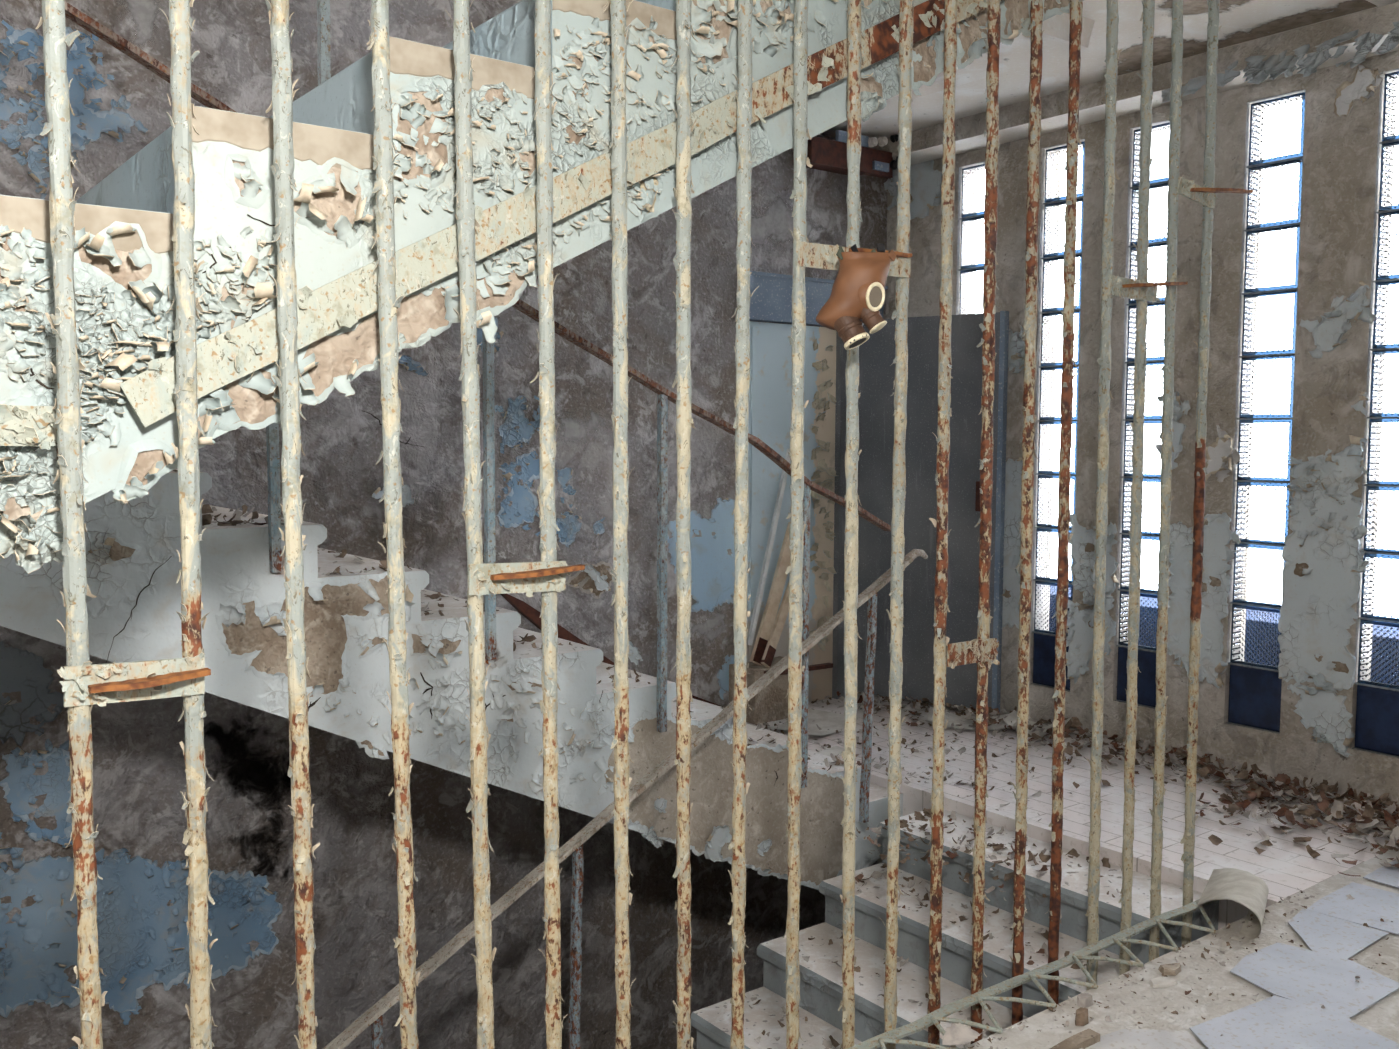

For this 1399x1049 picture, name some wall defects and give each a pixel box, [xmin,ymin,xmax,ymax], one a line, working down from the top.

peeling [74,221,178,505]
peeling [197,365,281,449]
peeling [297,310,380,406]
peeling [397,166,671,377]
peeling [0,446,64,574]
crack [106,556,172,662]
peeling [1278,435,1369,758]
peeling [0,641,80,1018]
water stain [204,716,291,879]
peeling [304,572,844,889]
peeling [95,847,190,1025]
peeling [208,868,282,980]